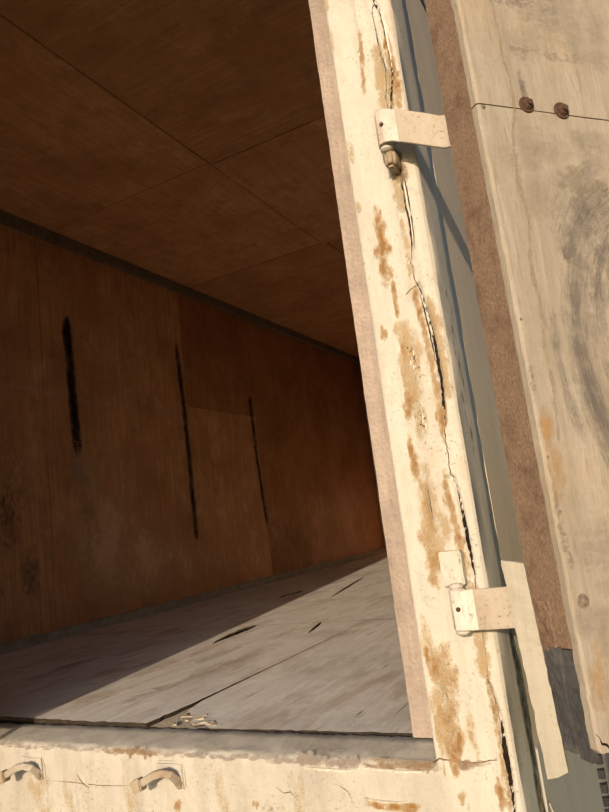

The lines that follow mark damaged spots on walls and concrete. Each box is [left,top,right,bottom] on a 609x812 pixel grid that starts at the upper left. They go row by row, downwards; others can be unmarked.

crack [372,0,393,109]
corrosion [391,151,408,210]
corrosion [373,207,453,436]
crack [400,173,477,589]
crack [212,625,257,644]
crack [331,577,363,597]
corrosion [373,629,480,777]
corrosion [407,439,474,589]
corrosion [474,630,511,811]